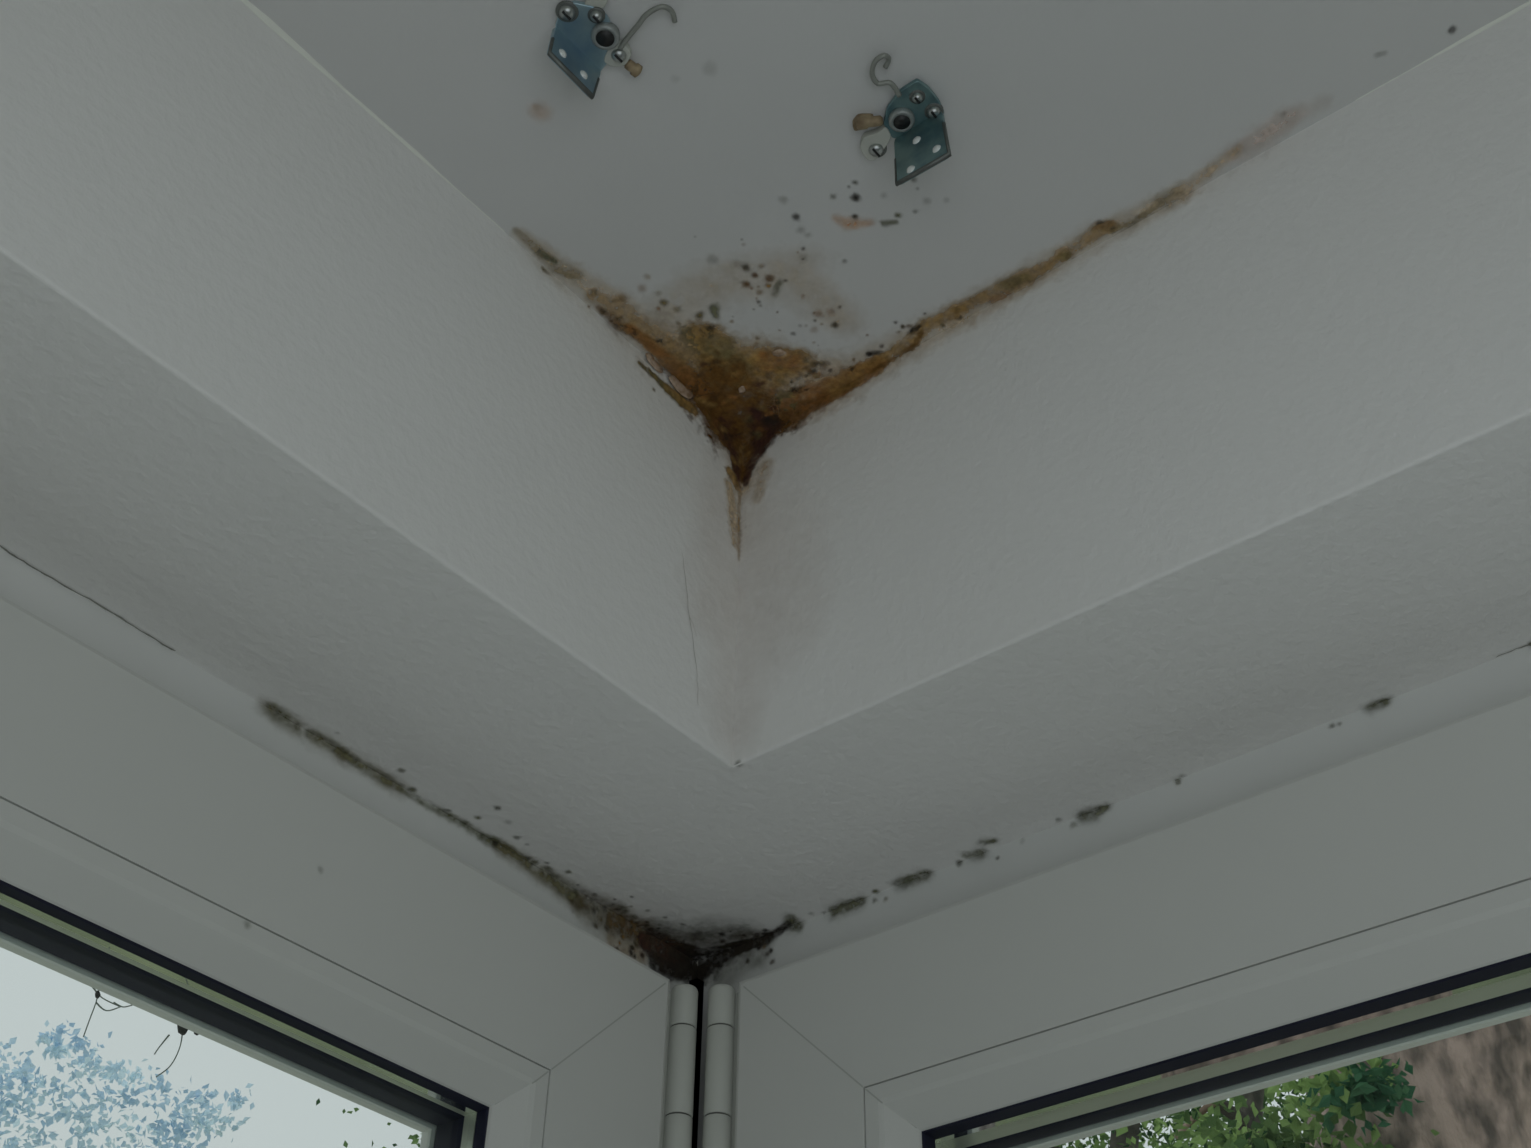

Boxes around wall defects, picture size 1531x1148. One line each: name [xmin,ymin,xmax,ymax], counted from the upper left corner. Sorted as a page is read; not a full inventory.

water stain [1368,698,1389,709]
water stain [1080,805,1109,820]
water stain [267,704,802,983]
water stain [958,839,998,865]
water stain [897,871,931,886]
water stain [830,890,878,916]